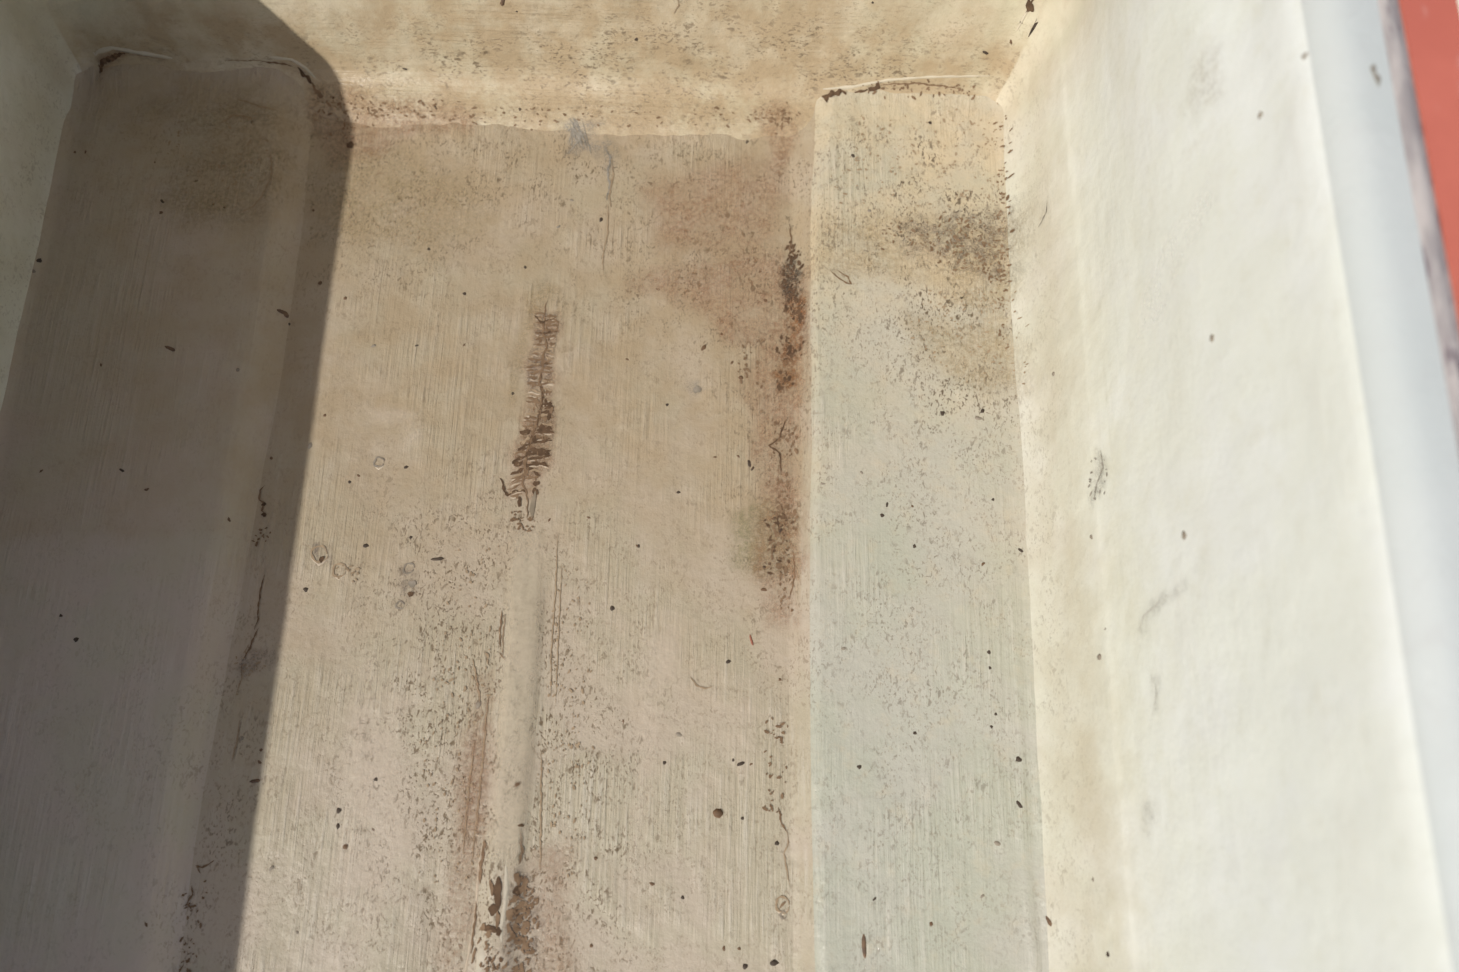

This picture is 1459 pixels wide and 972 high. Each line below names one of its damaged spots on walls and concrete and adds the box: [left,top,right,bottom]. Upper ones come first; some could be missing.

leakage [831,103,1029,385]
leakage [739,515,794,576]